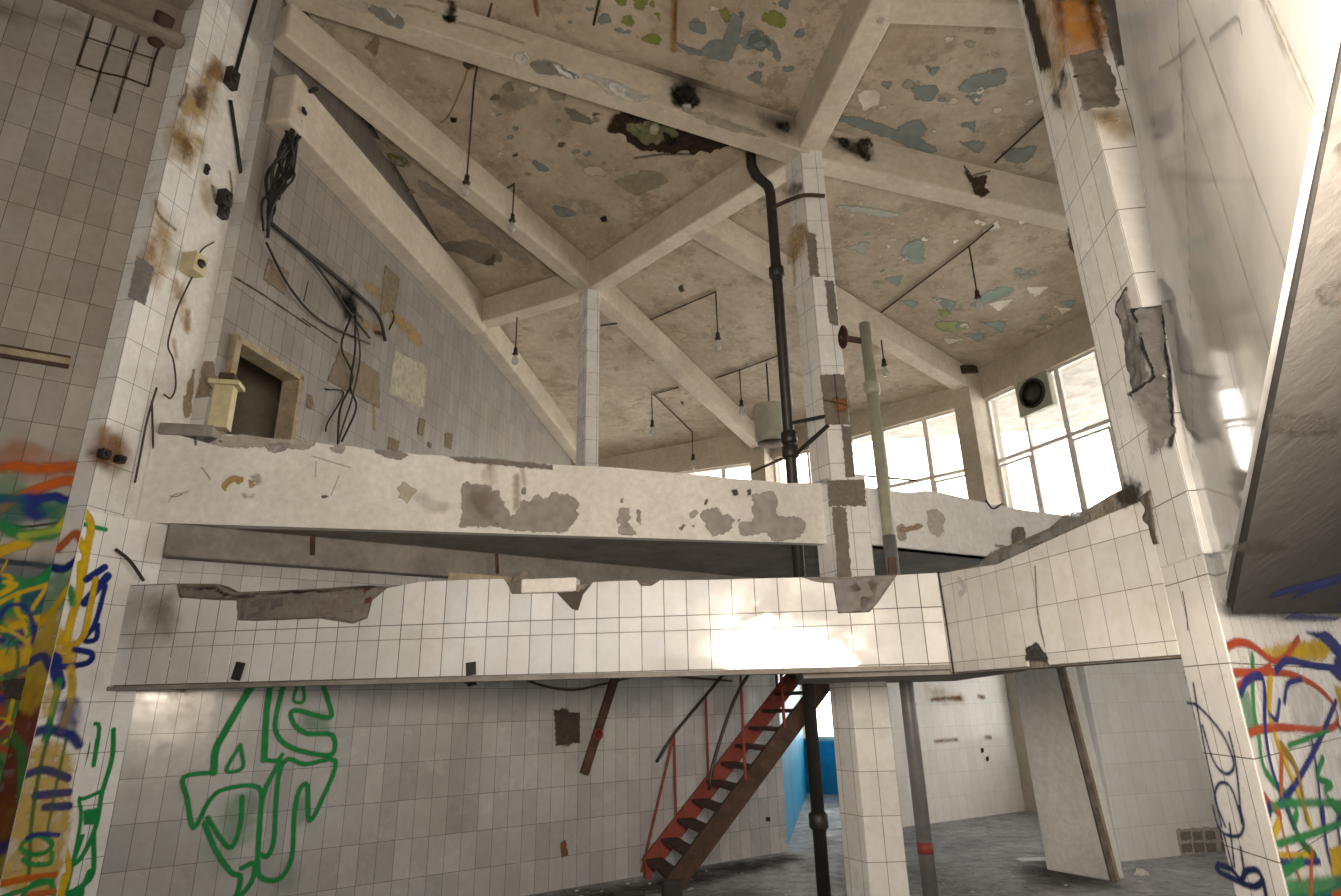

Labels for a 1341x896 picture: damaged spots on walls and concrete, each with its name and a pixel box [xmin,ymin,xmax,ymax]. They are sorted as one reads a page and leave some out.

peeling [586,0,804,84]
corrosion [1039,0,1109,106]
peeling [1070,0,1125,110]
corrosion [171,62,221,157]
spalling [490,52,767,196]
peeling [838,65,1007,154]
spalling [964,165,990,198]
peeling [880,237,1048,345]
spalling [1115,287,1176,455]
peeling [459,481,579,533]
peeling [679,489,806,542]
spalling [805,374,895,613]